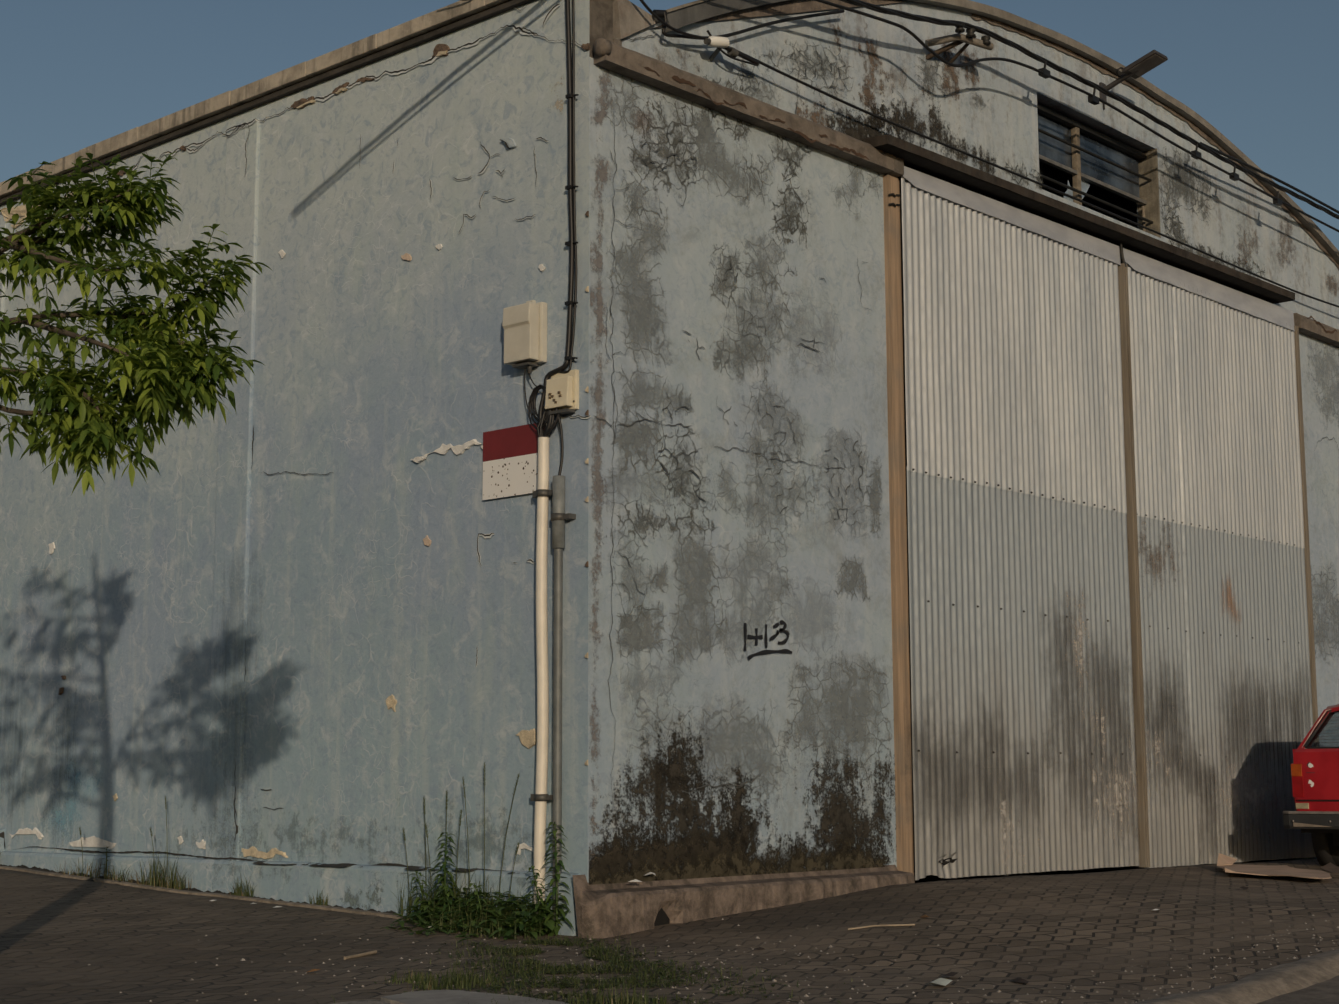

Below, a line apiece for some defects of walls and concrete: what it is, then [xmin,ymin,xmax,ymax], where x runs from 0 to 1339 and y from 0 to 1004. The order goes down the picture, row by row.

spalling [290,96,316,109]
crack [621,35,869,160]
mould [764,42,1042,189]
peeling [1,205,47,229]
damp [1159,151,1265,277]
damp [606,80,809,660]
peeling [411,439,483,463]
crack [593,72,864,832]
damp [869,467,882,533]
damp [589,659,896,885]
peeling [69,836,116,849]
peeling [241,846,288,859]